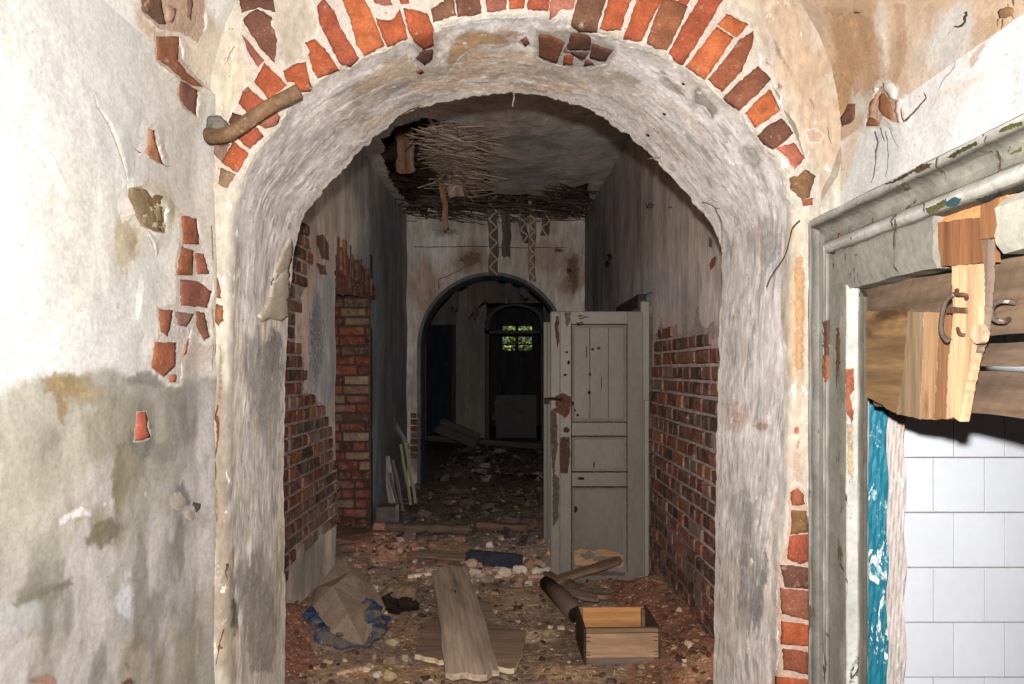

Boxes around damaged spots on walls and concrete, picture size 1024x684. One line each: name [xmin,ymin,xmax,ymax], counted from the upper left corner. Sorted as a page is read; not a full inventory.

flaking render [128,0,841,219]
flaking render [840,73,927,136]
flaking render [94,92,224,395]
damp [46,373,103,424]
damp [59,506,118,549]
damp [113,564,134,622]
flaking render [133,410,152,443]
flaking render [257,222,376,582]
flaking render [649,307,720,639]
flaking render [755,476,809,684]